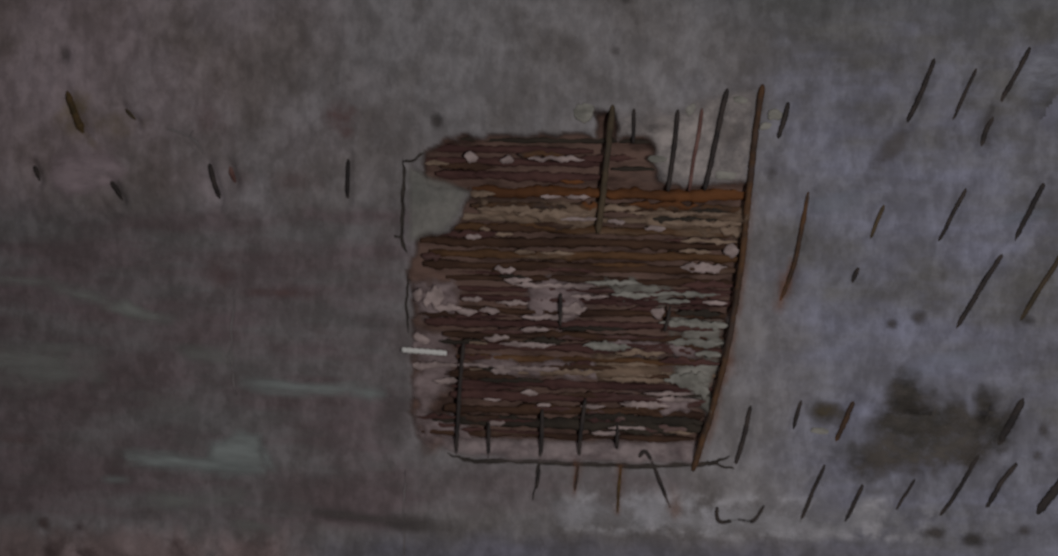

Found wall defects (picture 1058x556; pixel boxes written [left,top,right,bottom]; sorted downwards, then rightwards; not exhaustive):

spalling [407,84,783,513]
damp [857,380,1006,475]